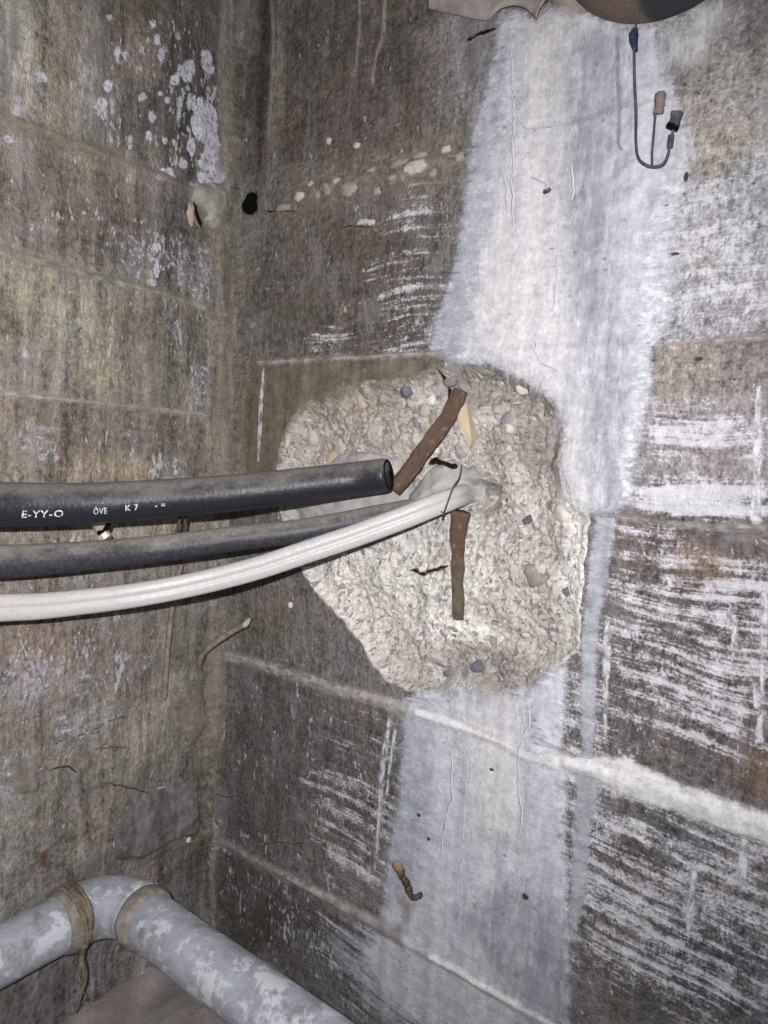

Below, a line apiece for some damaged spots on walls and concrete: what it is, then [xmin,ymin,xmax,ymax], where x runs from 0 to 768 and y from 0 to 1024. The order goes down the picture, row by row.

rust [393,387,467,495]
rust [449,509,471,621]
crack [516,698,531,847]